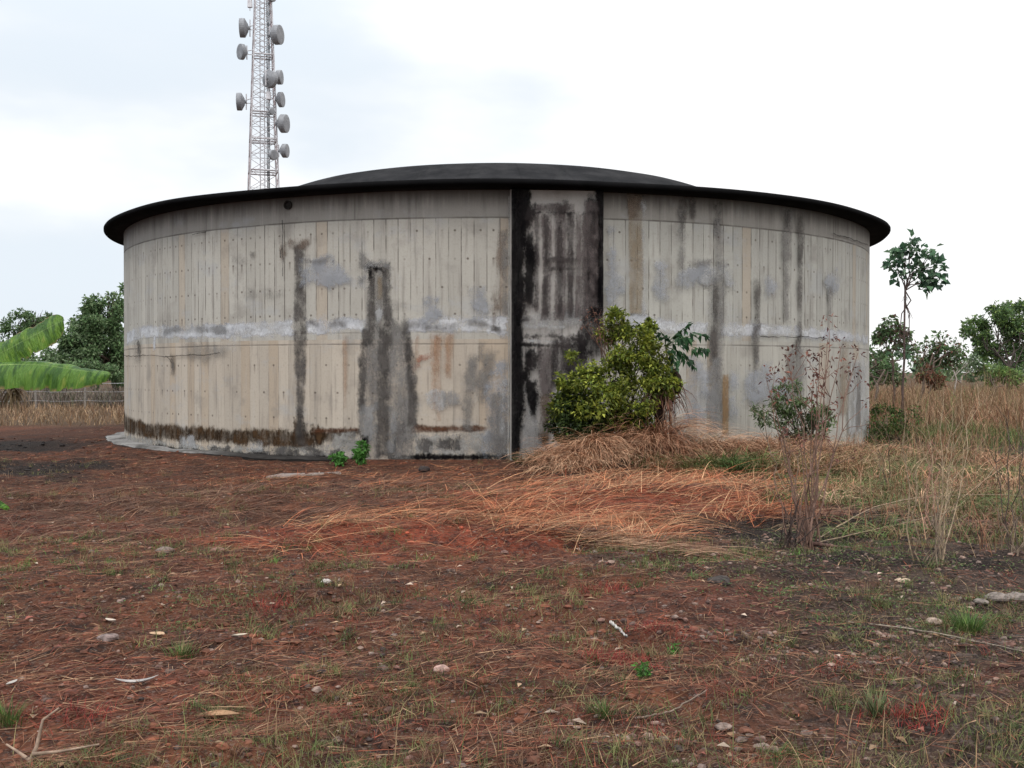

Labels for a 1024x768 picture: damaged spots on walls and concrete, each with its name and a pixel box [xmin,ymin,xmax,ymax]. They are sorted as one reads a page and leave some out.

leakage [124,187,667,461]
leakage [679,197,805,429]